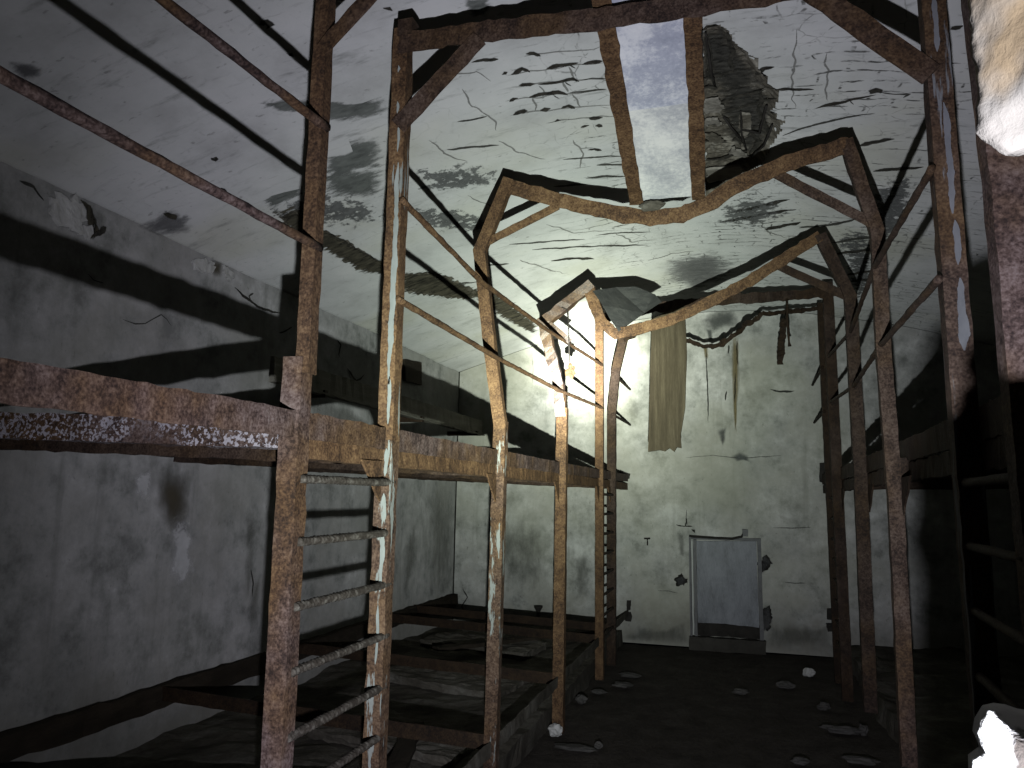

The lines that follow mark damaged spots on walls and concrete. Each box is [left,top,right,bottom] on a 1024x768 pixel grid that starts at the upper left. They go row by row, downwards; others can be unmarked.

crack [755,30,910,136]
leakage [267,101,310,112]
leakage [330,101,385,120]
crack [430,48,625,187]
flaking render [702,24,785,197]
crack [860,138,894,146]
flaking render [20,181,106,240]
leakage [266,189,304,215]
leakage [324,140,379,227]
crack [236,288,292,333]
flaking render [674,573,688,587]
flaking render [757,555,773,572]